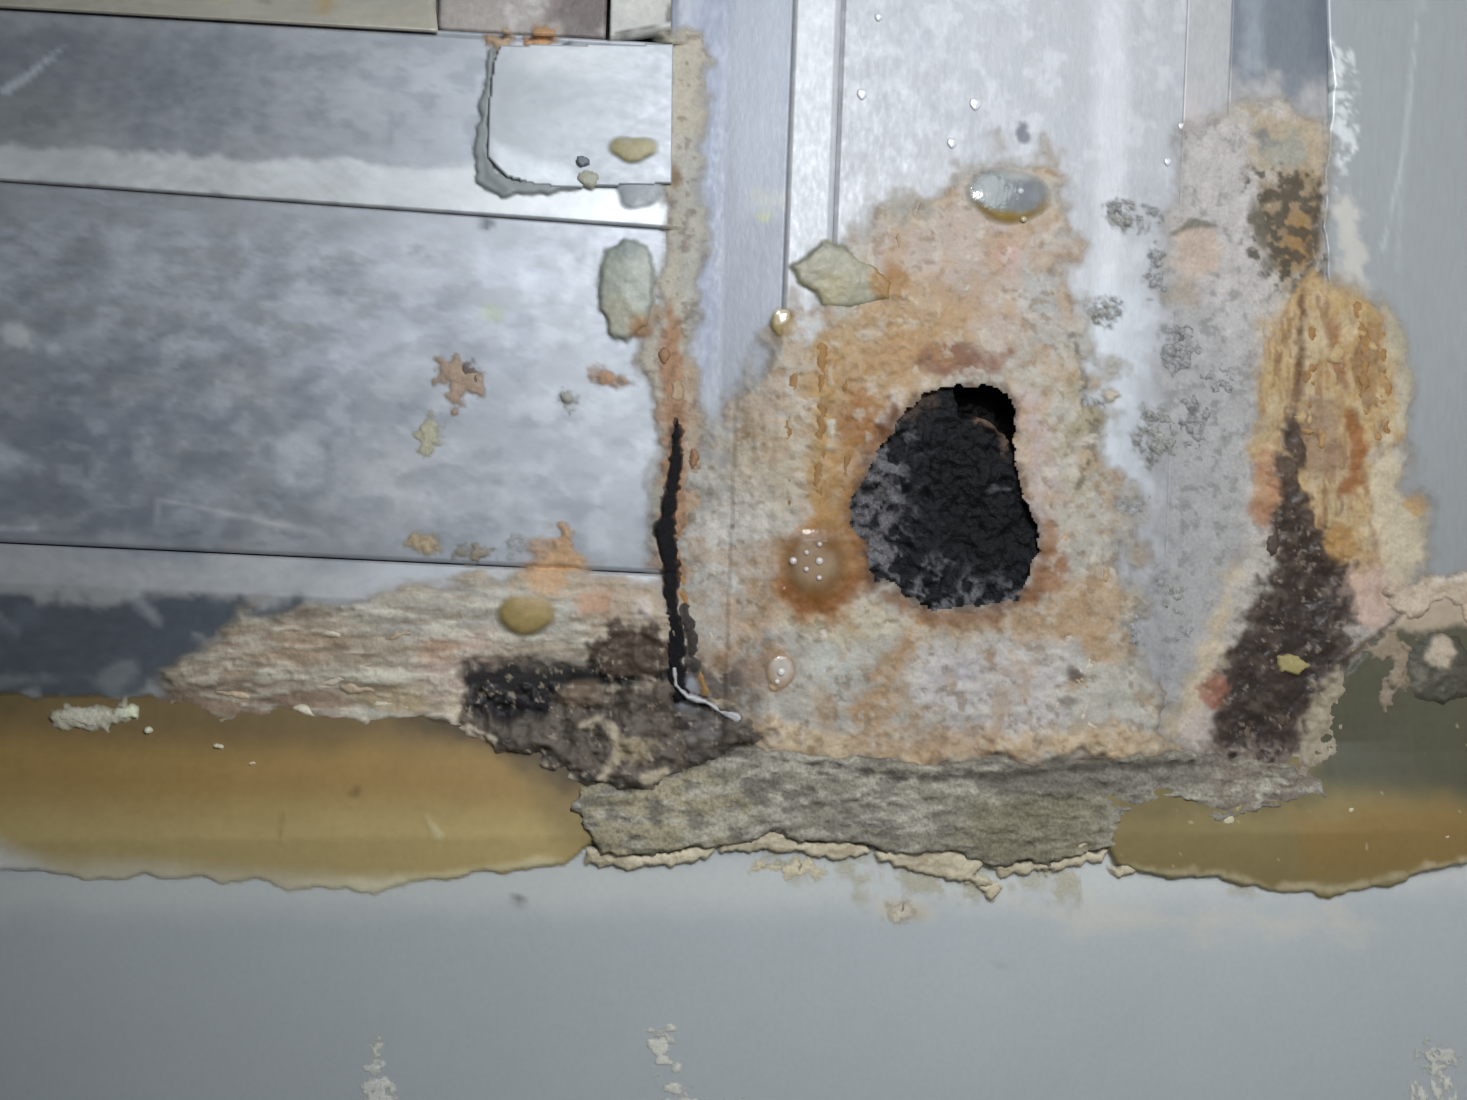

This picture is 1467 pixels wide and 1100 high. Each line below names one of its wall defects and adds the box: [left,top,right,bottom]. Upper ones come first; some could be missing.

water stain [1107,201,1163,231]
water stain [1146,249,1171,292]
water stain [1088,297,1121,327]
corrosion [161,25,1431,791]
water stain [1133,325,1233,469]
crack [653,418,752,745]
corrosion [49,699,138,733]
spalling [570,747,1327,902]
peeling [1415,1047,1462,1075]